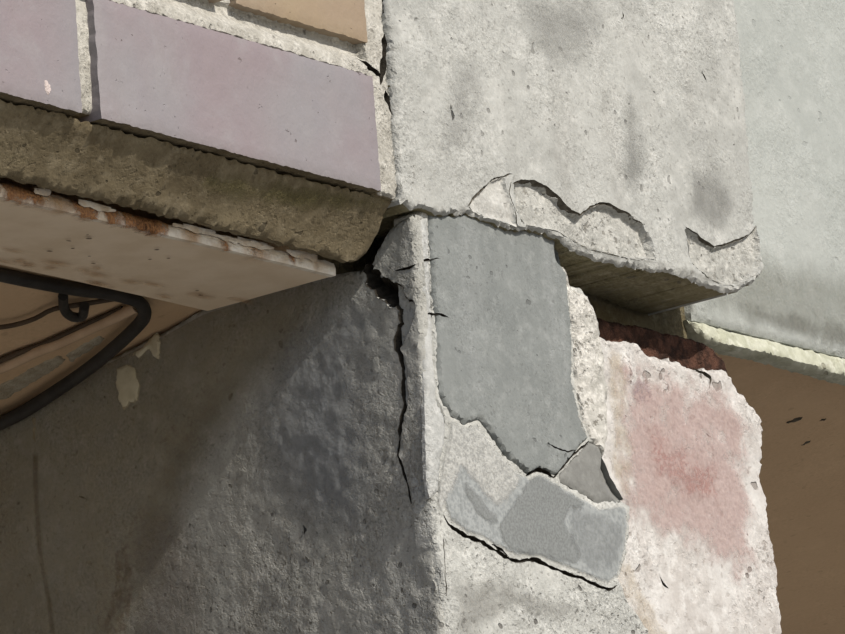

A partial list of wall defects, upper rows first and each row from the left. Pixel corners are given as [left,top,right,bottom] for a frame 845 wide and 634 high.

crack [360,34,392,114]
corrosion [2,183,44,205]
corrosion [68,199,169,237]
spalling [469,177,655,260]
spalling [685,226,761,286]
crack [363,258,448,504]
peeling [438,423,520,508]
crack [443,516,617,596]